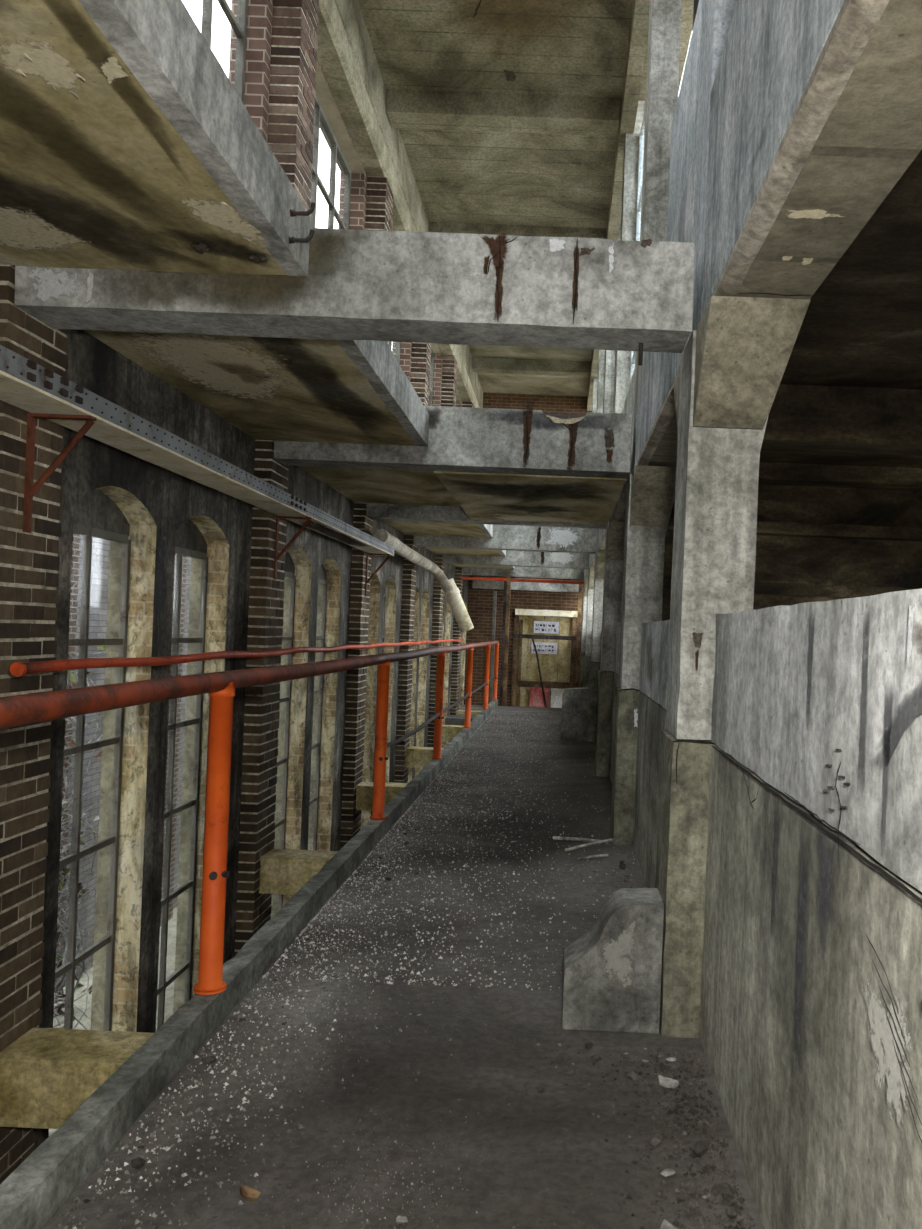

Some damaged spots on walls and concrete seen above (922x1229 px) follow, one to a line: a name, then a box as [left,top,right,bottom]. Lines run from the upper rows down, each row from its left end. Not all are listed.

peeling [0,40,85,99]
peeling [101,56,129,84]
leakage [0,175,337,304]
corrosion [481,234,509,275]
leakage [907,595,922,666]
leakage [858,617,922,846]